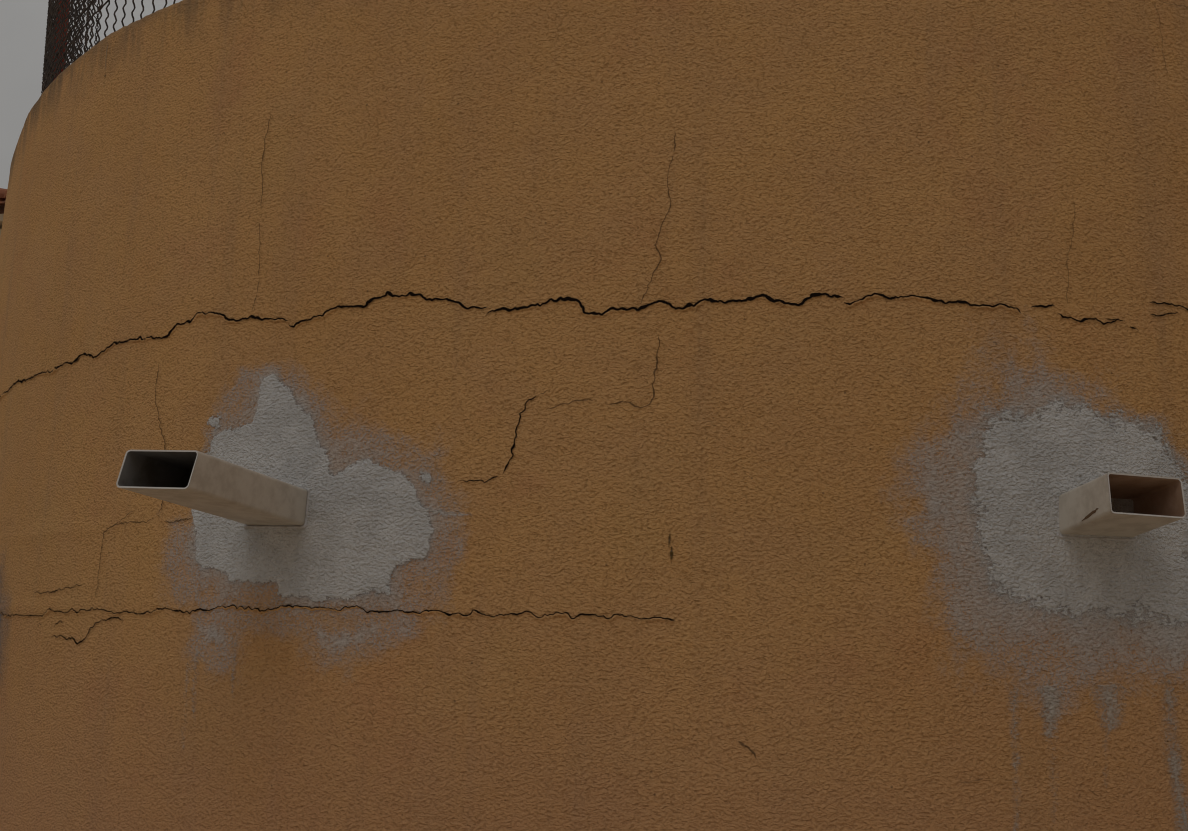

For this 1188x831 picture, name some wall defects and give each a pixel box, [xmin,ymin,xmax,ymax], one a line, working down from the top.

crack [0,116,1188,450]
crack [460,337,660,483]
crack [0,500,678,645]